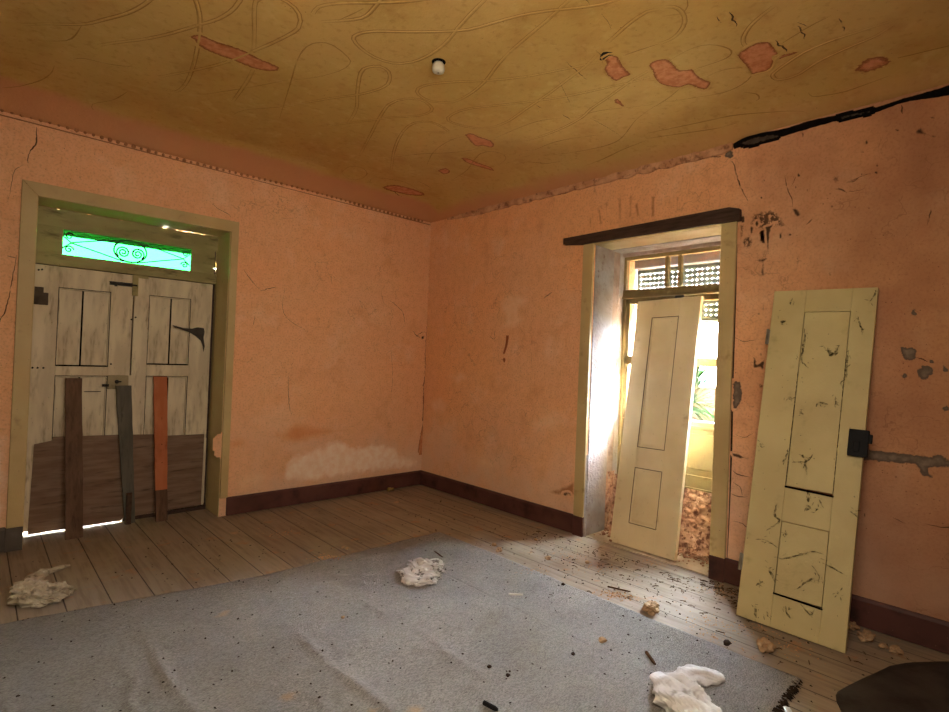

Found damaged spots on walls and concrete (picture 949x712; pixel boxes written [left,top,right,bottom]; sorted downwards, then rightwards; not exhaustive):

peeling [183,31,285,74]
peeling [598,51,634,83]
peeling [645,57,715,91]
flaking render [897,343,949,383]
damp [213,414,422,497]